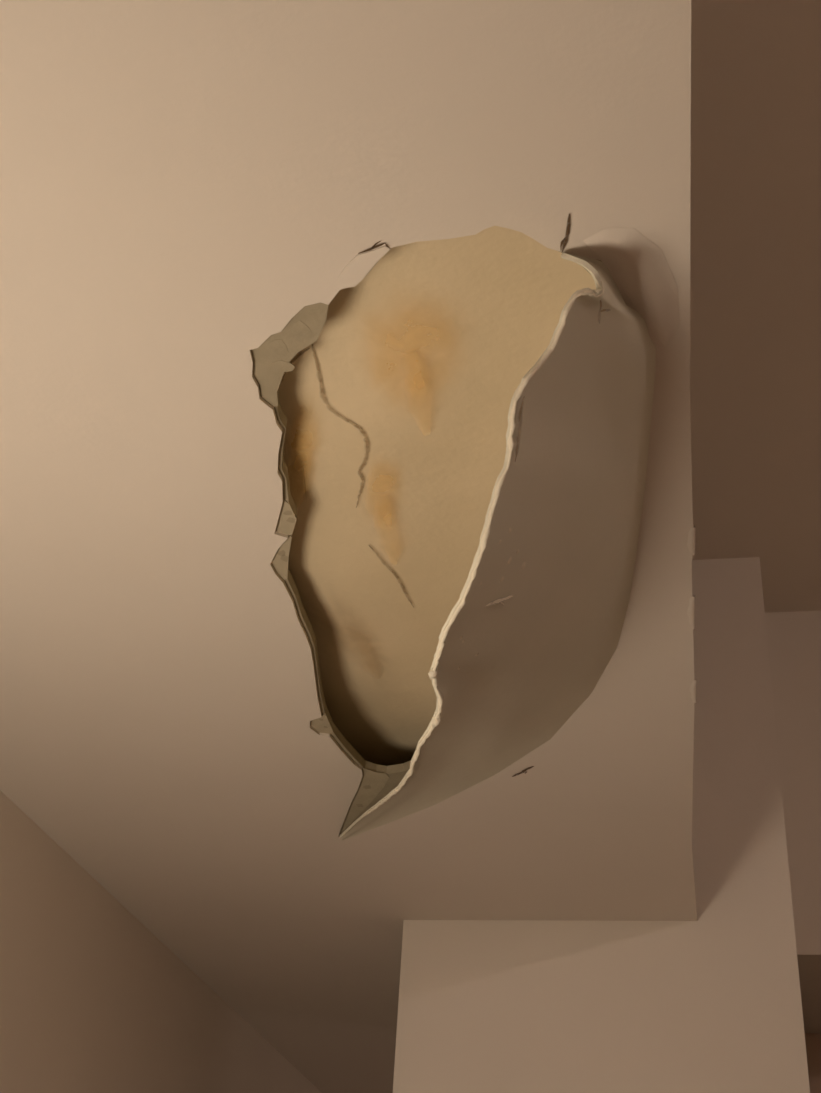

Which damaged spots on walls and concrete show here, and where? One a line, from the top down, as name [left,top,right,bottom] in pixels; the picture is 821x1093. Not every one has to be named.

peeling [336,245,390,295]
crack [280,344,369,507]
peeling [251,302,411,835]